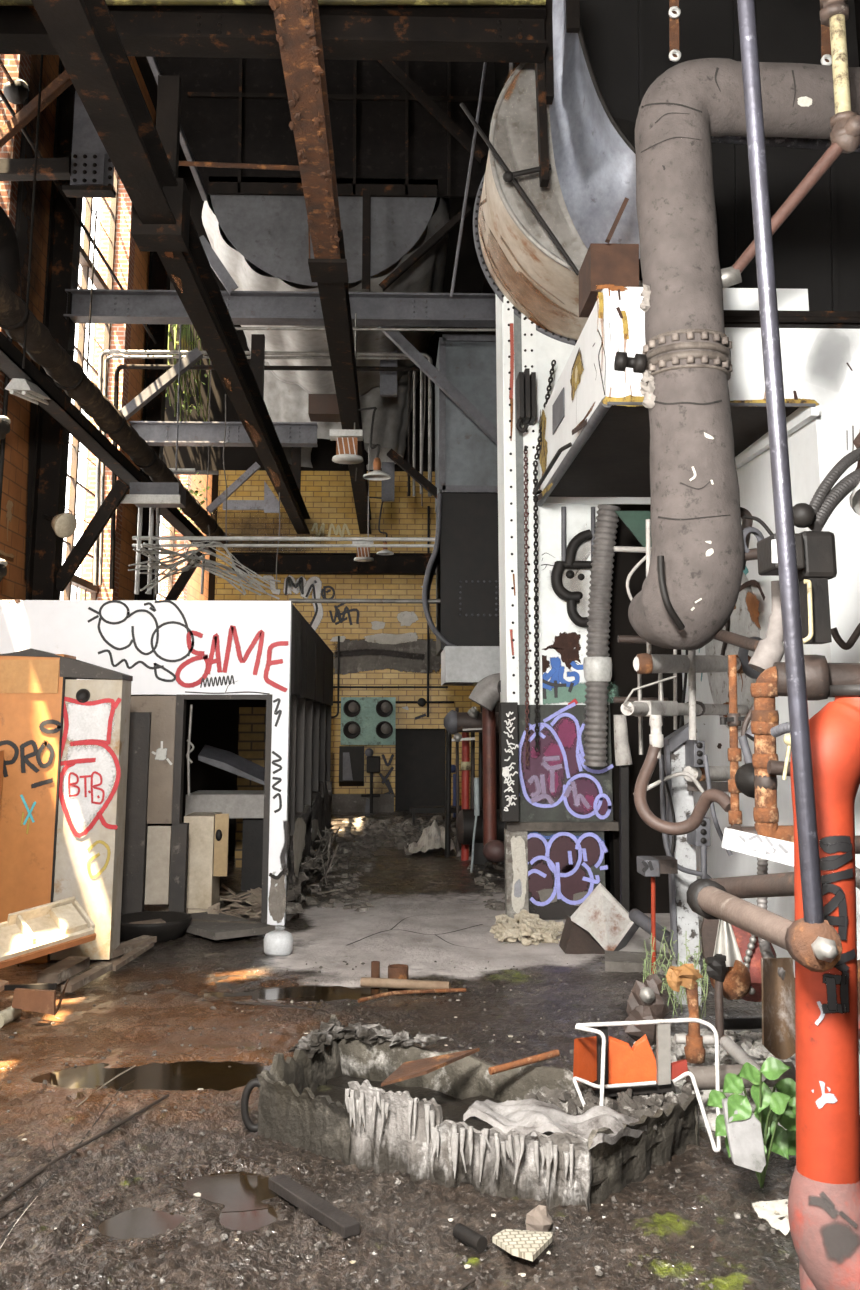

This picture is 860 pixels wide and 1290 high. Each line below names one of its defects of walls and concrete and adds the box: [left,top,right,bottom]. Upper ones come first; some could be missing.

rust [269,0,286,49]
rust [288,0,340,258]